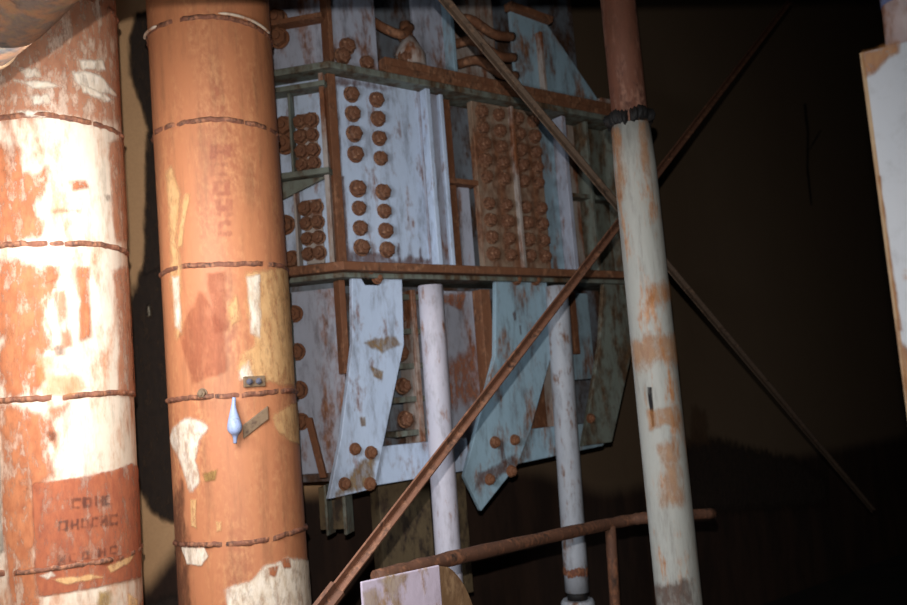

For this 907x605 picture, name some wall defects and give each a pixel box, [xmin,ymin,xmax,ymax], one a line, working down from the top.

rust [0,0,122,123]
rust [0,144,47,243]
rust [109,140,128,241]
rust [114,267,136,395]
rust [368,337,398,352]
rust [449,346,477,405]
rust [0,259,91,605]
peeling [170,418,216,528]
rust [305,417,328,478]
rust [477,446,515,486]
peeling [182,547,208,566]
peeling [227,558,312,605]